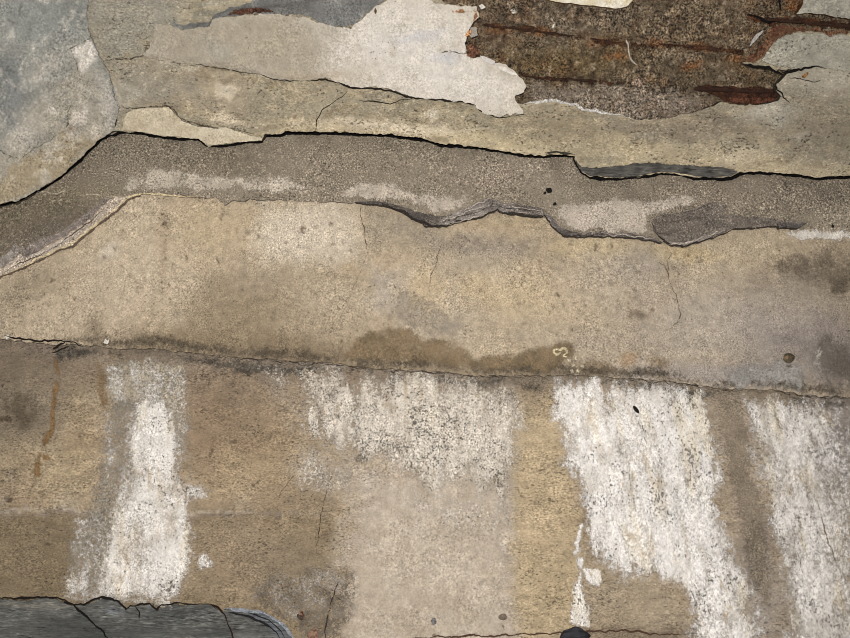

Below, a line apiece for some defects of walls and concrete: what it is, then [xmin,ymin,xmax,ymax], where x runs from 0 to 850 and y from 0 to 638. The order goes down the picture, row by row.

spalling [143,0,850,120]
corrosion [452,0,850,63]
crack [0,0,850,206]
corrosion [694,84,777,105]
spalling [576,161,737,178]
flaking render [355,198,806,248]
crack [4,335,81,353]
corrosion [35,361,59,476]
leakage [61,357,212,608]
leakage [259,328,850,638]
spalling [0,598,294,638]